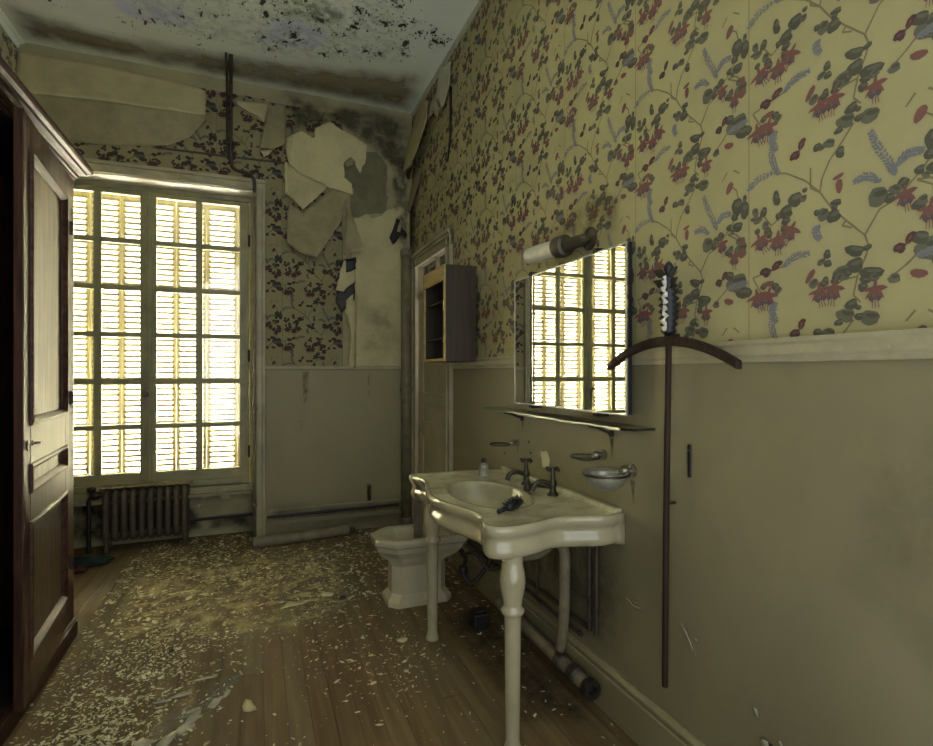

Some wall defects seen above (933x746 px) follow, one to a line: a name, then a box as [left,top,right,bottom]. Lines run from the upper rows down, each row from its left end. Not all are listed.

water stain [30,0,408,102]
flaking render [285,122,367,194]
flaking render [352,206,410,366]